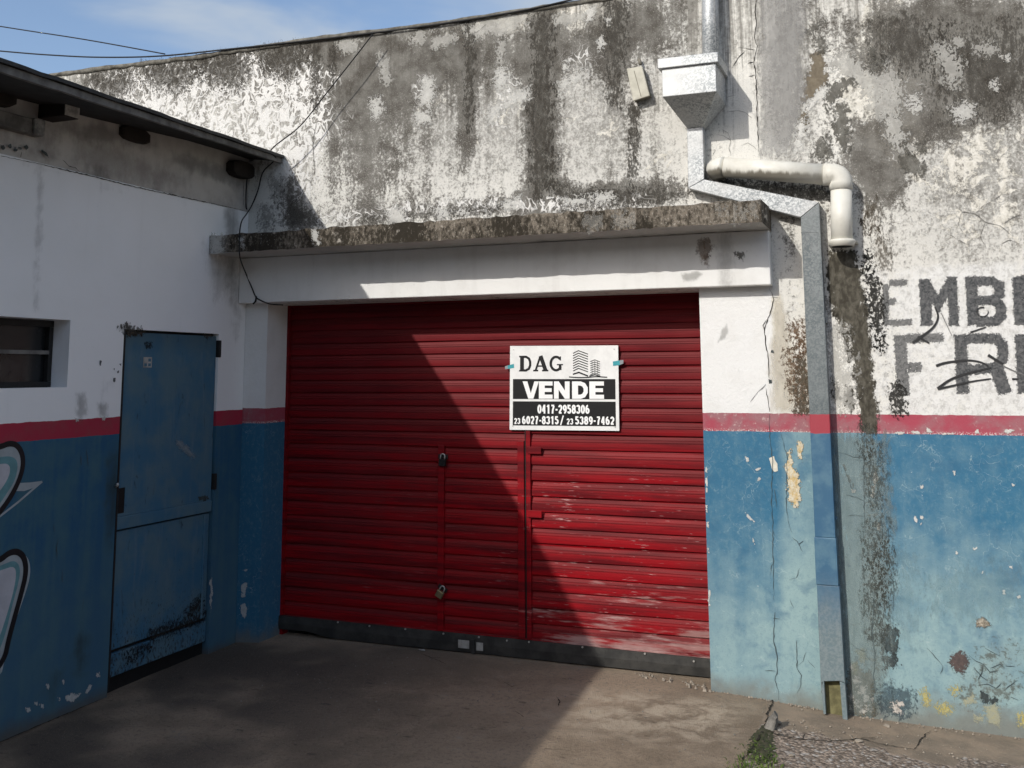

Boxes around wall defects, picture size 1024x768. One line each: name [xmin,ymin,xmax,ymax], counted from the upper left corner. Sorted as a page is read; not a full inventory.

leakage [86,39,337,112]
leakage [462,21,478,134]
leakage [524,0,694,212]
leakage [356,200,503,225]
leakage [791,352,810,416]
spalling [745,441,804,508]
crack [737,292,929,766]
spalling [975,617,990,628]
peeling [59,672,100,702]
peeling [973,691,1002,728]